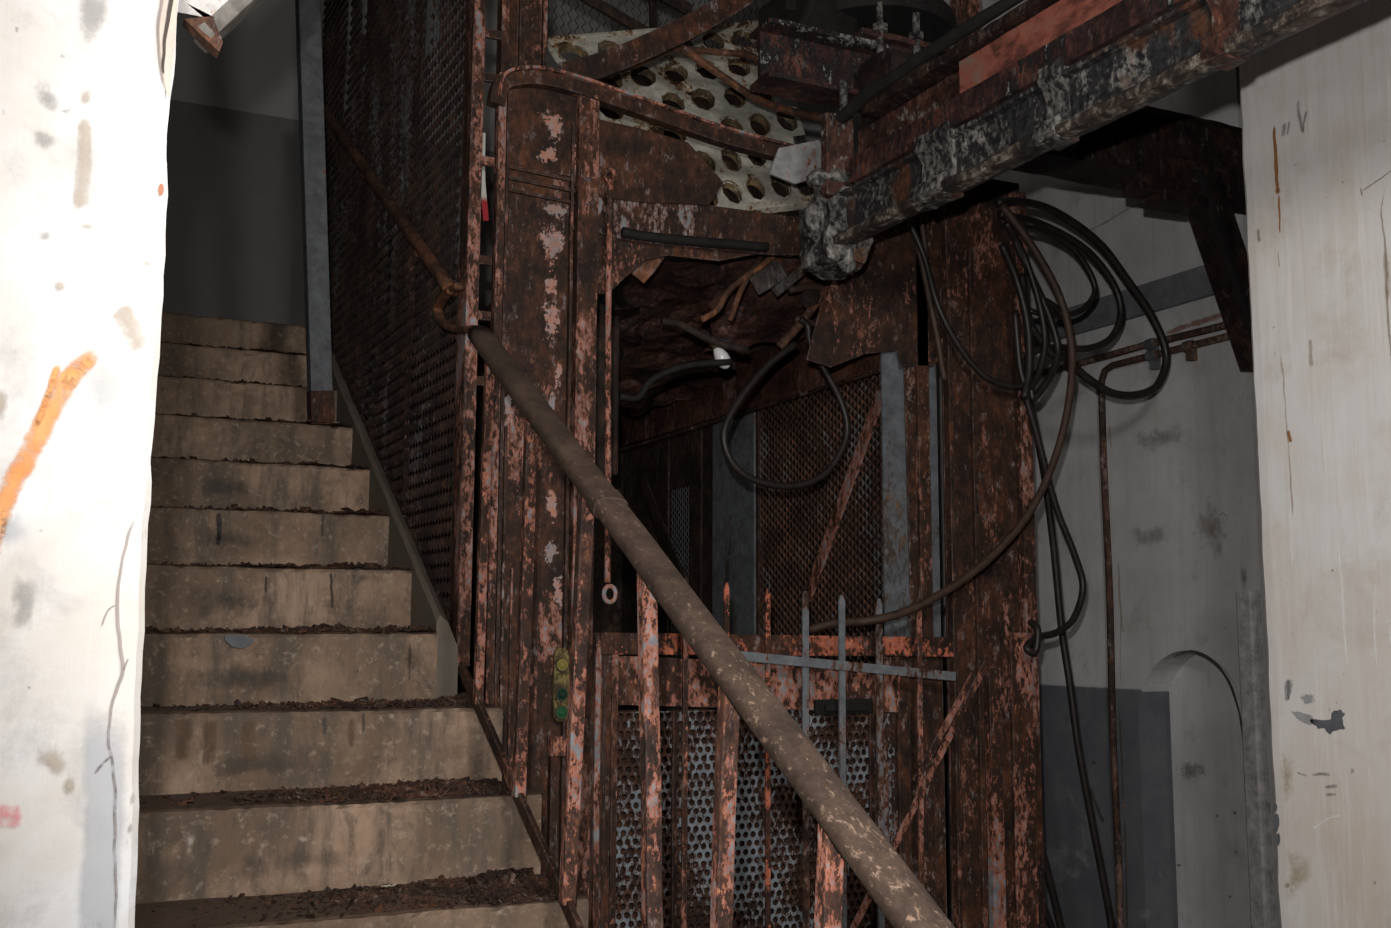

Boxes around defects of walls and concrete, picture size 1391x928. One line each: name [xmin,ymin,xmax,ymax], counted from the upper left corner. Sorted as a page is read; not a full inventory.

peeling [1285,681,1345,734]